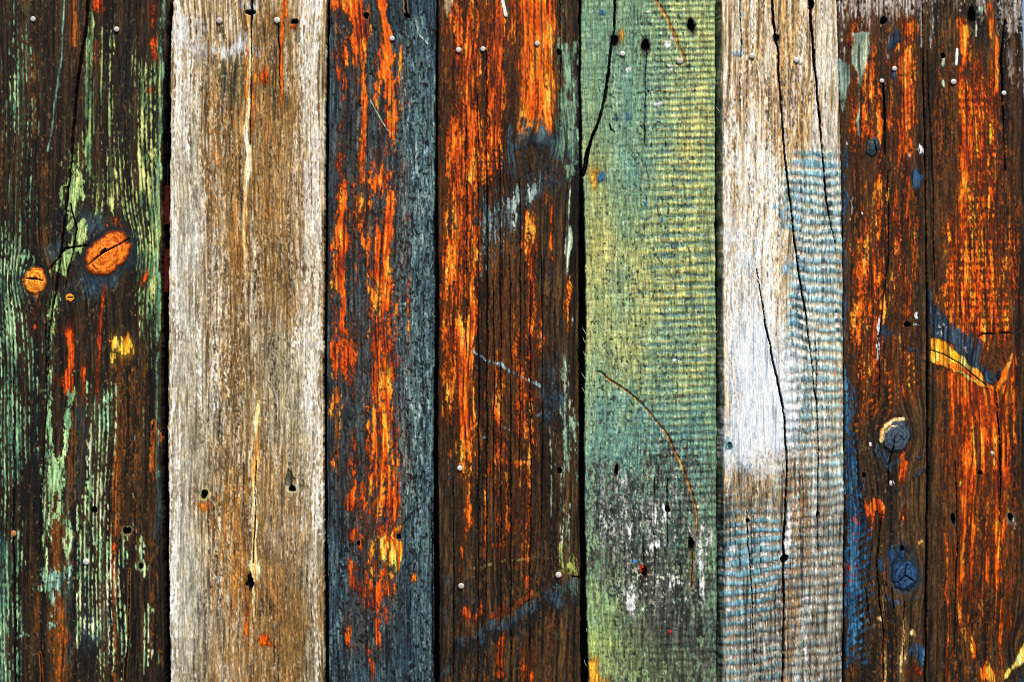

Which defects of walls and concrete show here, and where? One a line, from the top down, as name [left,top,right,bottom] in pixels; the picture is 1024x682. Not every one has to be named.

peeling [0,0,165,682]
peeling [329,0,411,676]
peeling [462,576,534,620]
peeling [439,0,579,576]
crack [582,0,616,177]
peeling [589,472,825,679]
crack [756,269,788,682]
crack [771,0,819,550]
crack [808,0,835,242]
peeling [773,17,924,673]
peeling [930,338,1024,682]
peeling [942,3,1016,350]